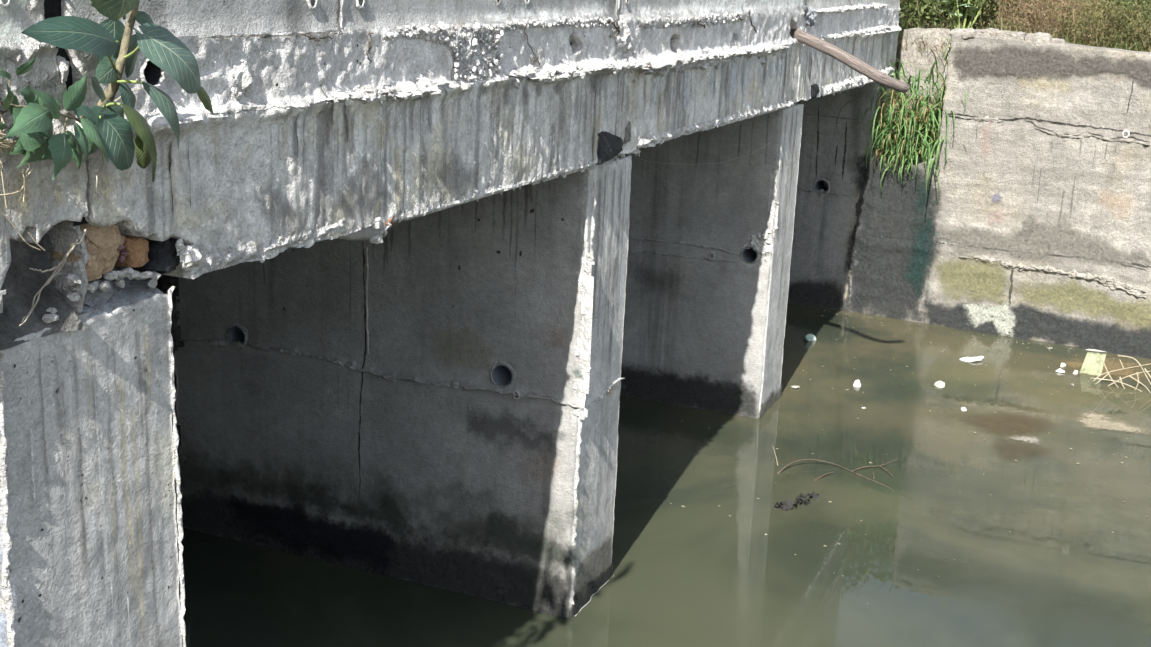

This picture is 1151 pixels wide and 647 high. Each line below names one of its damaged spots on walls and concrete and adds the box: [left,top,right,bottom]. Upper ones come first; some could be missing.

leakage [342,109,354,192]
crack [947,71,1151,142]
leakage [594,172,624,346]
leakage [788,155,1151,359]
spalling [0,218,346,647]
crack [357,241,367,513]
leakage [175,454,613,619]